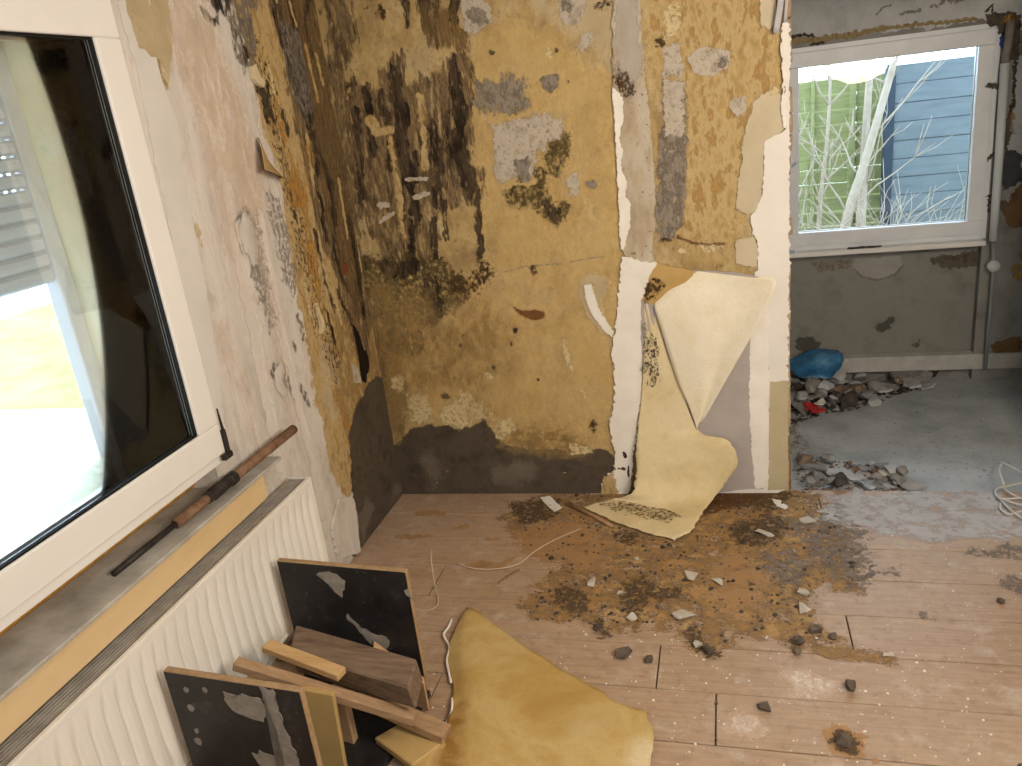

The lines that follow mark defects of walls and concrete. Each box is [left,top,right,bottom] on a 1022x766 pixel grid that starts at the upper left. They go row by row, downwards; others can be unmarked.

peeling [125,0,174,90]
spalling [539,73,559,93]
spalling [487,110,565,189]
water stain [169,0,681,548]
peeling [654,0,1022,493]